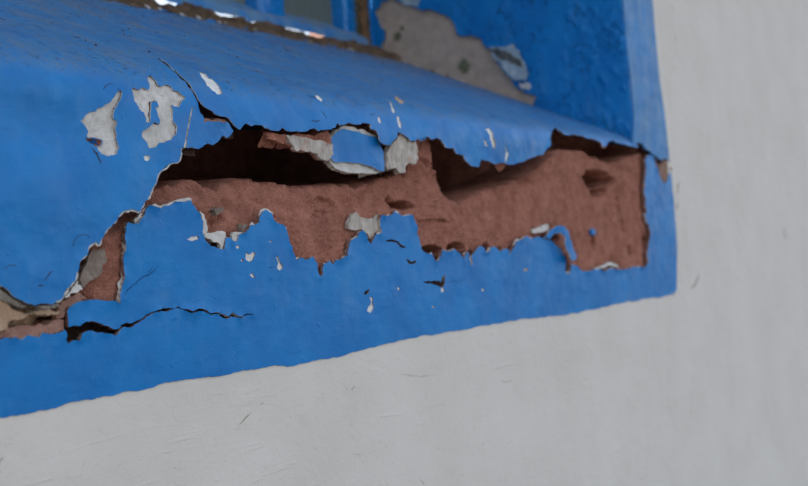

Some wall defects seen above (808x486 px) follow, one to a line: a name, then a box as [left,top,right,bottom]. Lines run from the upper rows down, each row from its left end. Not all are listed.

peeling [132,76,184,161]
crack [164,63,233,156]
peeling [200,73,221,95]
peeling [377,0,536,105]
spalling [0,91,659,339]
crack [37,308,247,342]